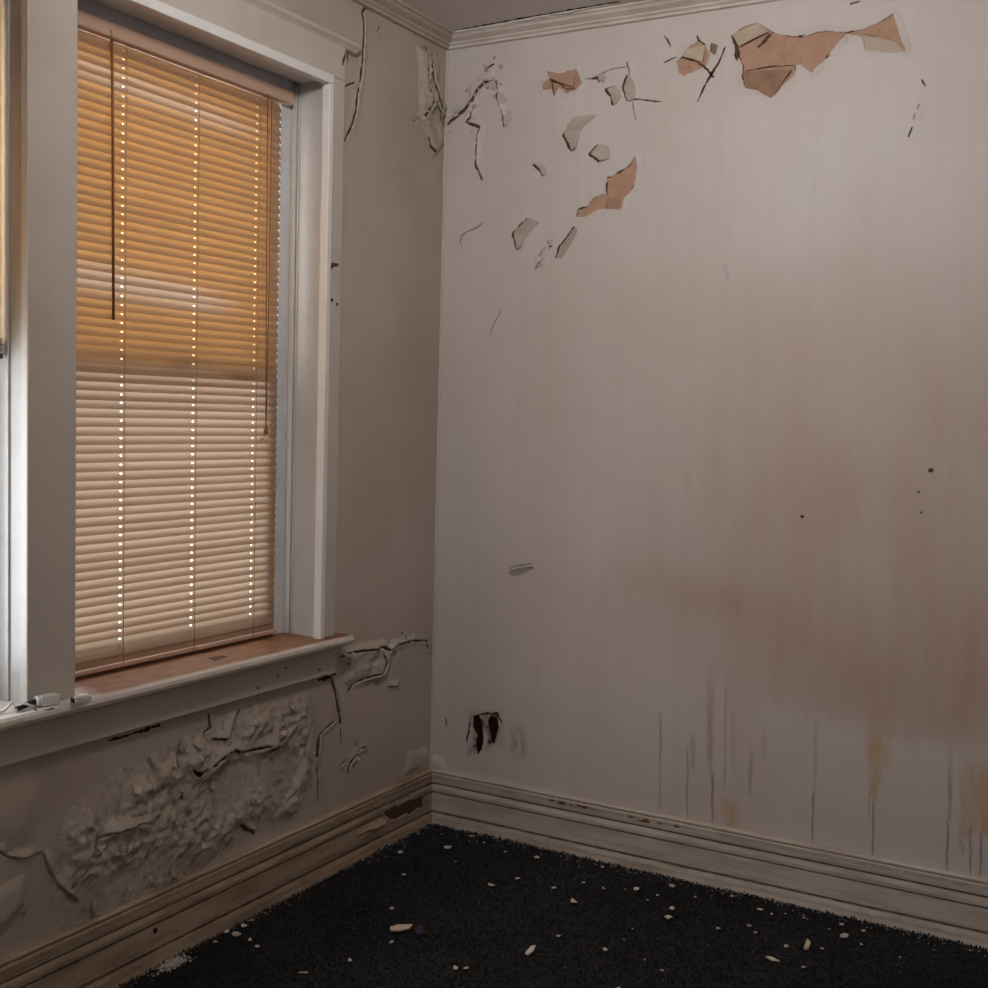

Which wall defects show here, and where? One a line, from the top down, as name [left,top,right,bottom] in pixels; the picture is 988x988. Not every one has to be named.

crack [454,0,634,31]
peeling [664,7,912,107]
peeling [537,64,636,106]
peeling [562,115,596,152]
peeling [555,144,642,258]
peeling [512,218,539,249]
damp [574,215,988,878]
crack [316,628,432,802]
peeling [357,790,426,844]